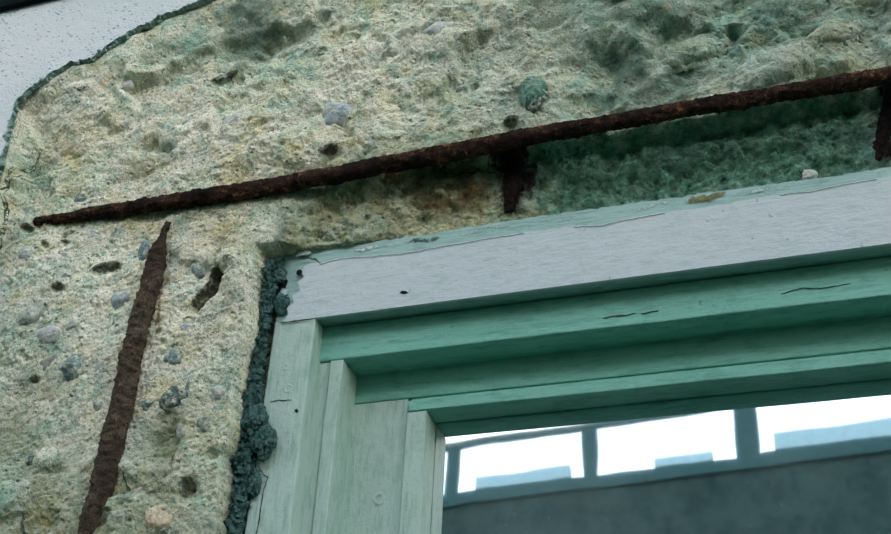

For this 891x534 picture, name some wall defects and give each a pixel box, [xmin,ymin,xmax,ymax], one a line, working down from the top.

spalling [0,0,215,179]
spalling [221,113,243,125]
spalling [322,101,353,126]
spalling [138,240,152,261]
spalling [191,262,206,279]
spalling [16,299,47,325]
spalling [110,291,131,310]
spalling [36,325,62,344]
spalling [61,354,82,381]
spalling [262,308,277,403]
spalling [211,386,226,400]
spalling [144,503,179,530]